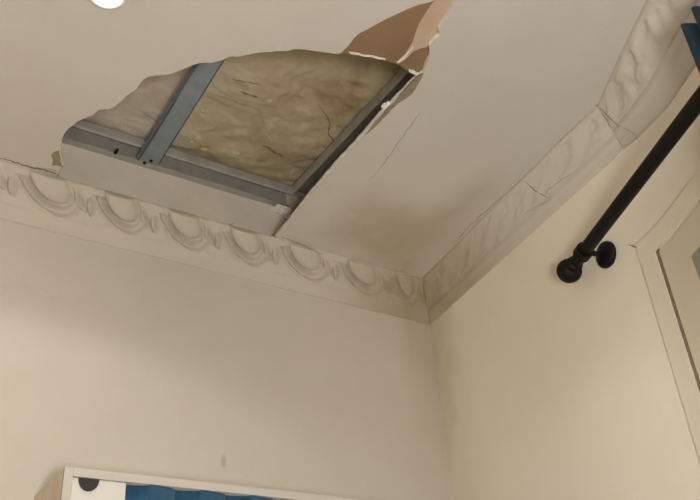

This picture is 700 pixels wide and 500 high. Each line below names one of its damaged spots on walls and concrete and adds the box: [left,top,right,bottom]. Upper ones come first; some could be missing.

peeling [341,0,435,134]
spalling [268,204,293,220]
crack [456,105,639,241]